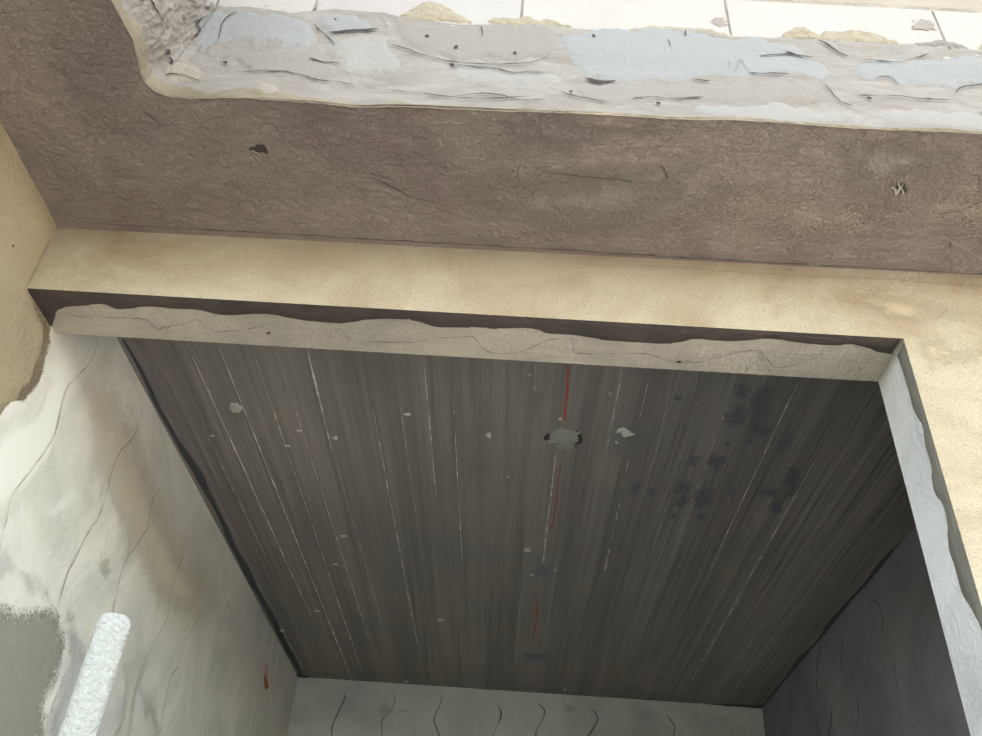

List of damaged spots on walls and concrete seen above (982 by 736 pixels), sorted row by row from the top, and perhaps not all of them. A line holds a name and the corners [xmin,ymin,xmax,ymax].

leakage [0,545,87,736]
crack [0,342,97,547]
crack [57,408,142,608]
leakage [0,301,209,630]
crack [113,487,161,612]
leakage [113,647,162,736]
crack [331,693,345,736]
crack [621,350,853,368]